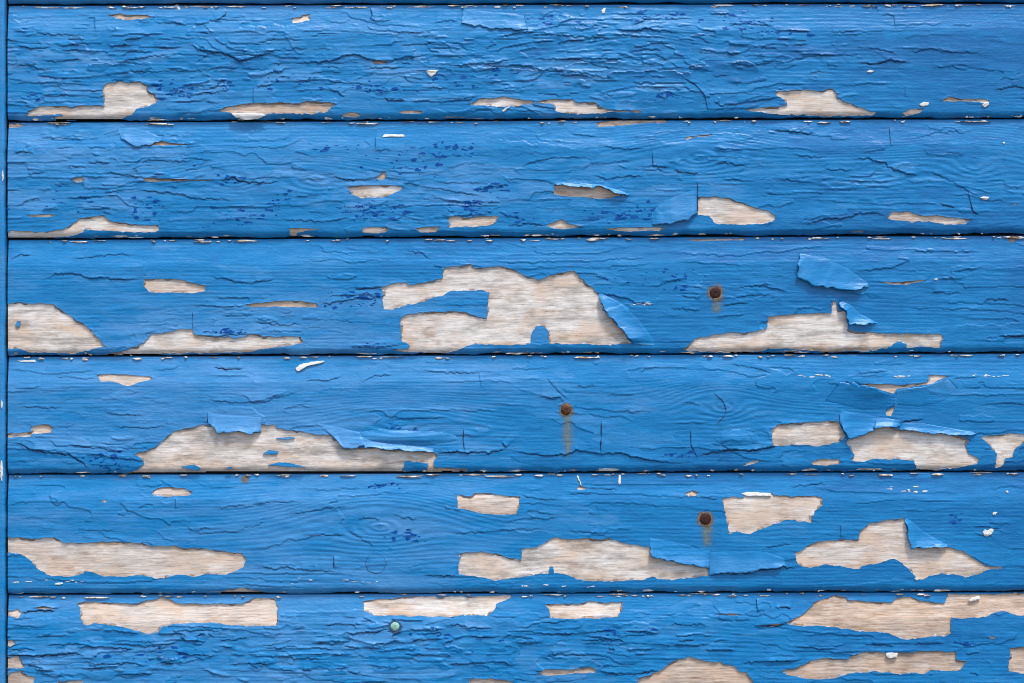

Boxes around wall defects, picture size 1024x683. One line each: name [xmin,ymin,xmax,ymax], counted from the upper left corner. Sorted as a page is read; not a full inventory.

crack [120,8,613,96]
crack [88,160,346,222]
crack [527,129,978,214]
peeling [8,302,330,371]
peeling [246,264,665,359]
peeling [683,253,973,358]
peeling [76,412,543,497]
crack [396,393,785,463]
corrosion [697,512,713,543]
peeling [8,537,246,618]
peeling [355,518,1024,683]
crack [15,610,822,683]